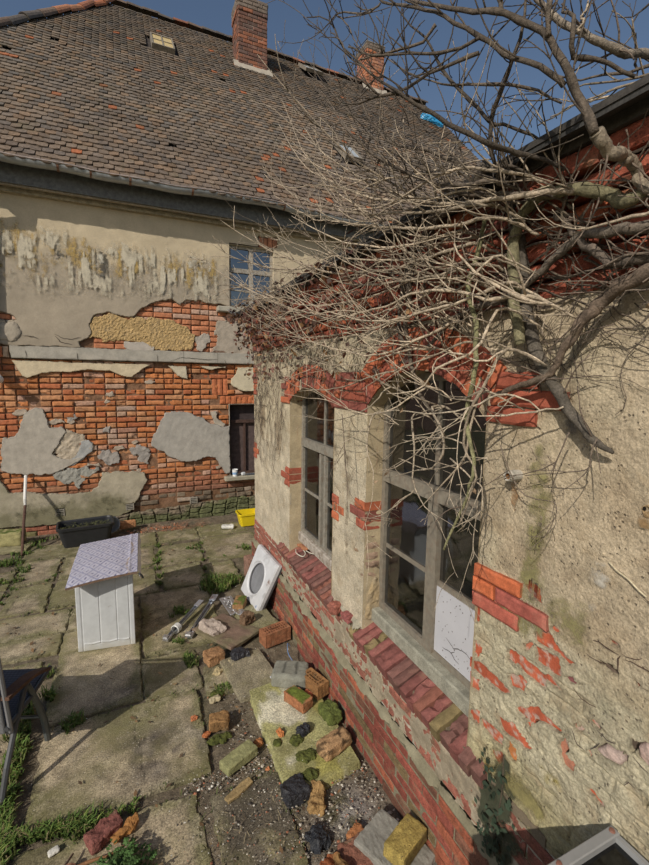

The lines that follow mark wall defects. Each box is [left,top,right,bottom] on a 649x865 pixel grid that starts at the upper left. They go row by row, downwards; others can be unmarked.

flaking render [89,300,251,354]
flaking render [0,346,255,506]
flaking render [526,580,542,603]
flaking render [470,626,577,693]
flaking render [471,709,532,764]
flaking render [518,706,576,771]
spalling [589,739,649,765]